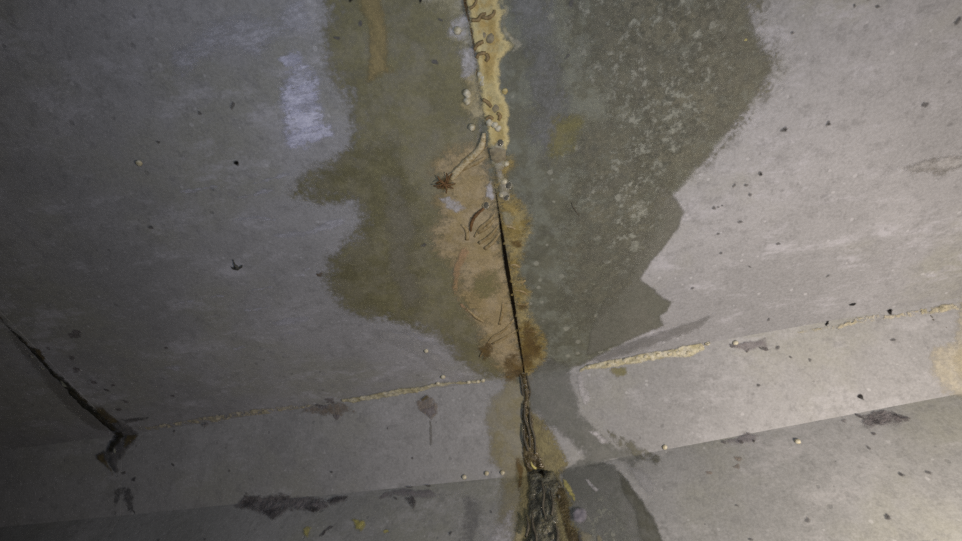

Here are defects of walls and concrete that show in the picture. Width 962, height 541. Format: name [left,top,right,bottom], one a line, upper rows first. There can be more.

leakage [280,55,333,150]
crack [464,0,482,105]
crack [495,189,525,374]
leakage [294,0,777,541]
crack [0,317,118,432]
spalling [236,493,347,520]